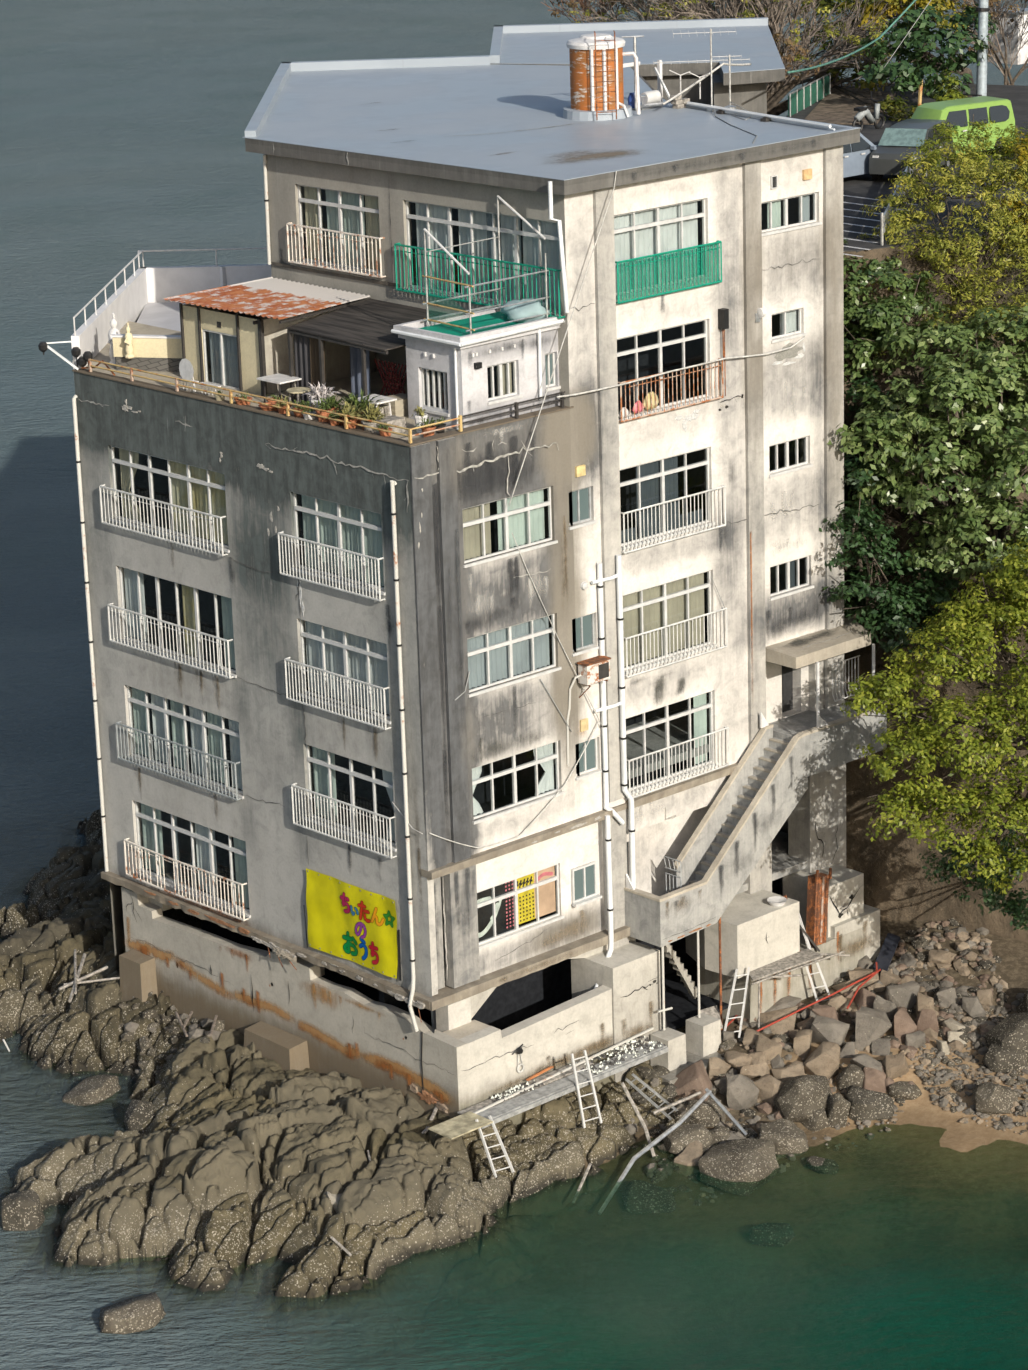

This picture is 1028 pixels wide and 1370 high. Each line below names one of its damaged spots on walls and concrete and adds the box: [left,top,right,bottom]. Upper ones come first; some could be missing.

leakage [567,151,632,162]
crack [266,441,559,508]
leakage [508,557,547,603]
rust [127,919,449,1103]